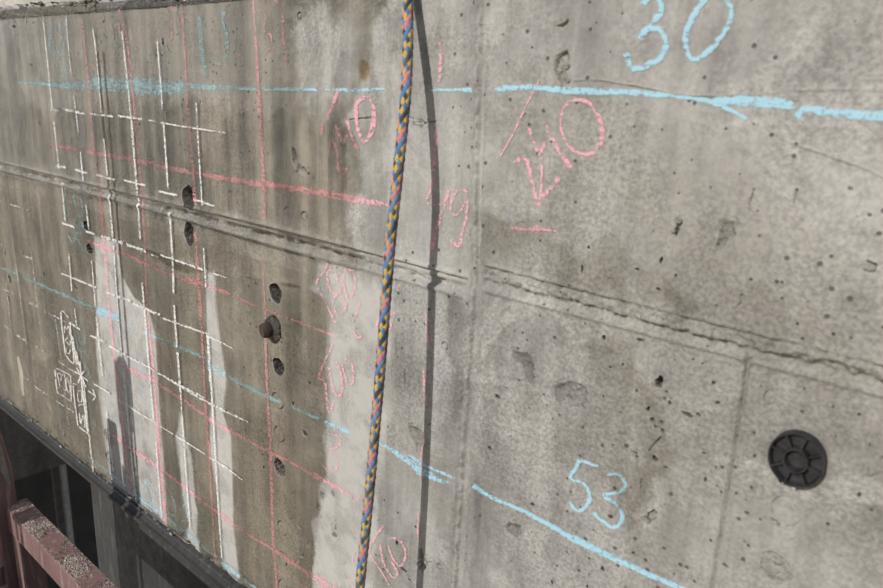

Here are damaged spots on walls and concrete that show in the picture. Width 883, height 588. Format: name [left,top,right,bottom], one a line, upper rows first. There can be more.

spalling [0,0,232,20]
crack [788,184,802,208]
damp [96,245,157,366]
damp [207,303,222,352]
damp [330,274,390,353]
damp [351,375,373,412]
damp [103,360,165,523]
damp [211,415,233,528]
damp [324,402,369,511]
damp [223,546,238,570]
damp [345,537,373,588]